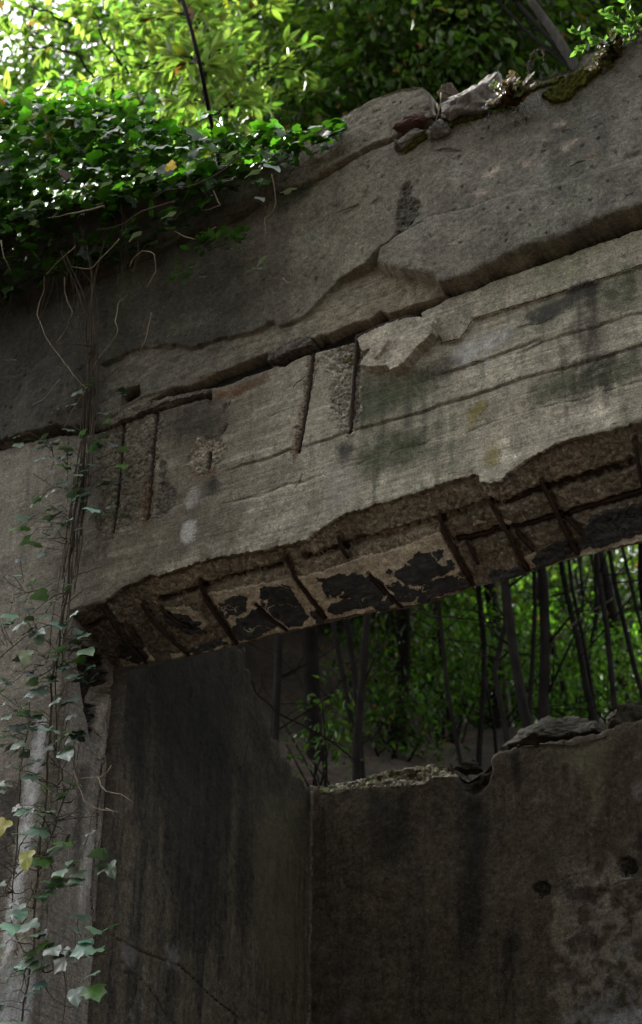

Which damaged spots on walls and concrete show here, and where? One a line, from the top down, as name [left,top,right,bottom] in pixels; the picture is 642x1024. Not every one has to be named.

crack [394,182,422,236]
crack [320,315,422,352]
crack [437,264,642,375]
crack [200,363,305,434]
spalling [95,411,177,539]
spalling [186,436,227,479]
peeling [488,502,642,584]
peeling [163,532,475,655]
spalling [317,764,464,793]